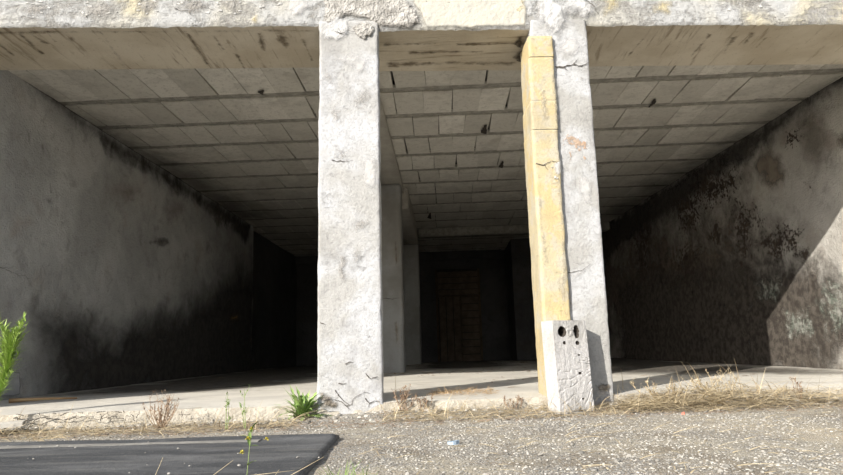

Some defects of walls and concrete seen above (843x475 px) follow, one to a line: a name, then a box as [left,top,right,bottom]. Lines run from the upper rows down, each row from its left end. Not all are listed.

spalling [323,0,419,39]
corrosion [565,134,587,160]
leakage [756,151,784,185]
leakage [603,162,811,346]
crack [335,362,378,409]
crack [13,410,140,424]